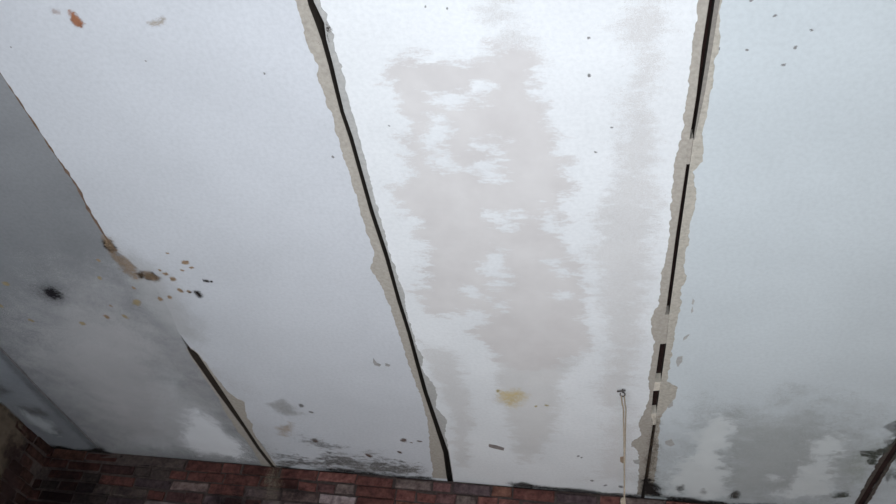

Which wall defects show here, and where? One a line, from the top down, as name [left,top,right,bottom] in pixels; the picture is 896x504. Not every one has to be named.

corrosion [52,8,87,28]
corrosion [96,233,202,306]
peeling [0,402,60,504]
crack [0,347,100,450]
damp [257,399,435,504]
damp [507,380,896,504]